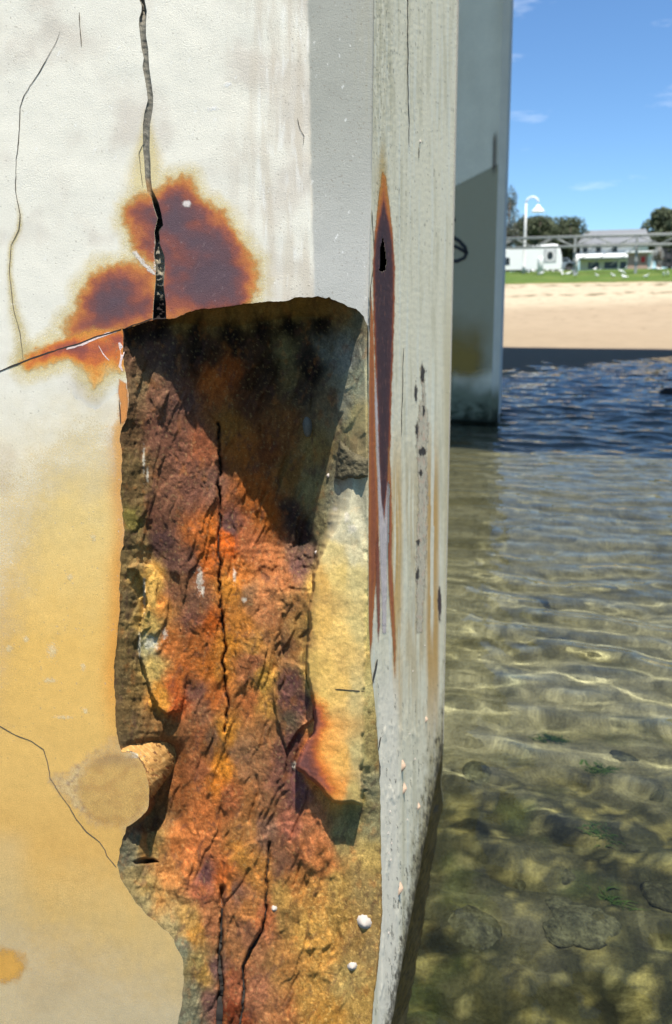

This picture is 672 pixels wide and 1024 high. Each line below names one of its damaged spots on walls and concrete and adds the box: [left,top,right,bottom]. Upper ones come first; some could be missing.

crack [0,0,166,372]
corrosion [19,173,260,389]
corrosion [368,160,396,670]
crack [0,726,116,867]
spalling [114,296,383,1024]
corrosion [295,695,336,796]